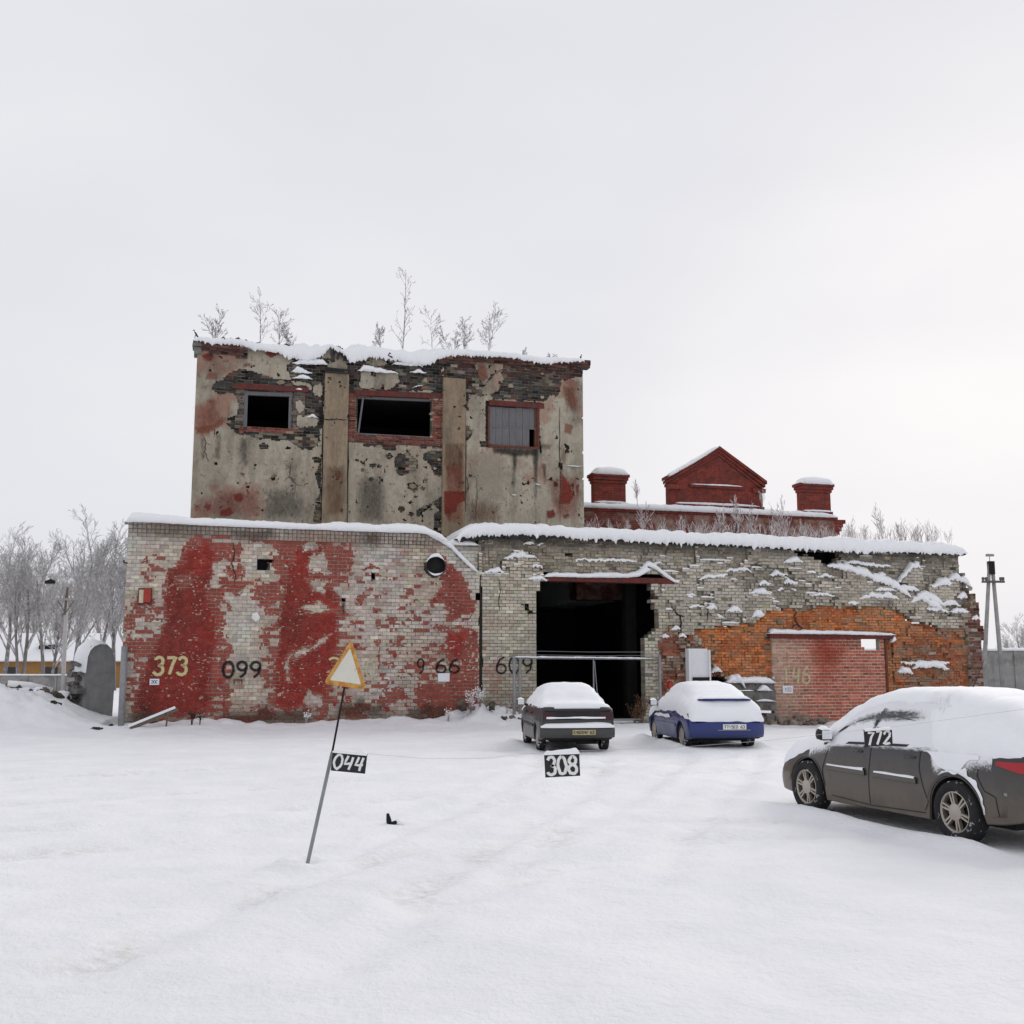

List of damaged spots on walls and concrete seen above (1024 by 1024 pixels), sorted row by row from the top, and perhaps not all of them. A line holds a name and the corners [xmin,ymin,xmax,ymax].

spalling [197,358,331,523]
spalling [346,358,583,534]
peeling [123,534,483,724]